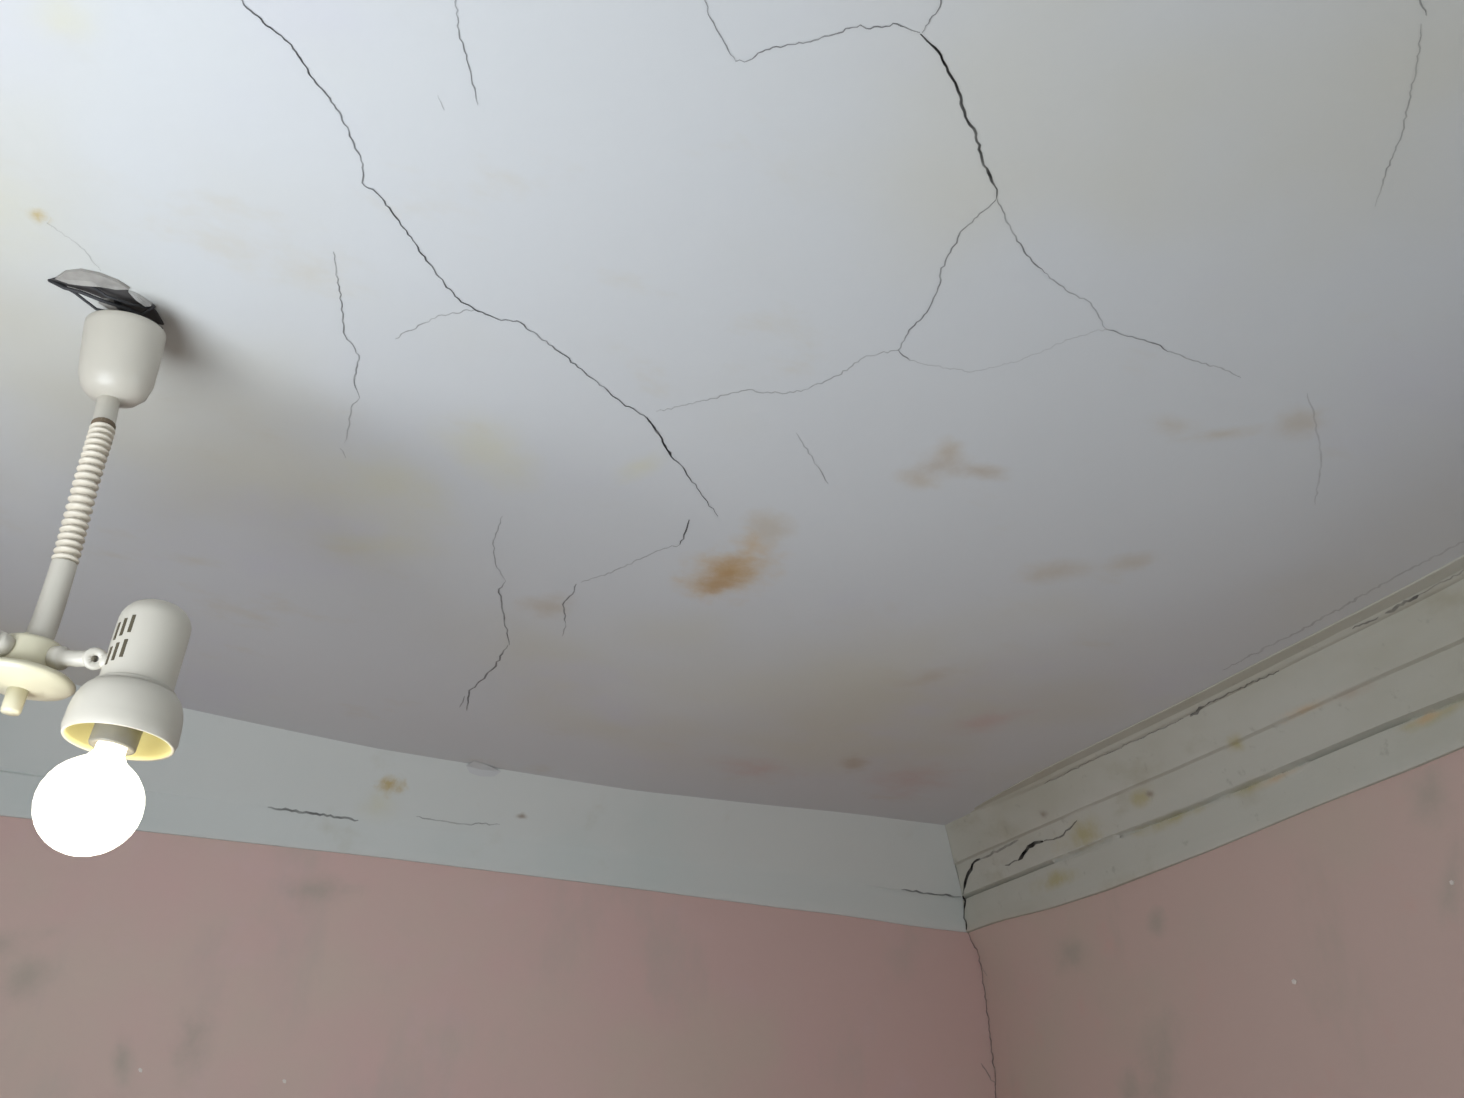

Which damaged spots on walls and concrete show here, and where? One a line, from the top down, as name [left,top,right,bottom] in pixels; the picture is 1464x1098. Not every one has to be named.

crack [708,14,783,62]
crack [829,0,998,204]
crack [242,0,718,544]
crack [898,228,964,360]
crack [1019,242,1044,272]
damp [880,431,1023,497]
crack [466,589,509,709]
crack [902,821,1077,949]